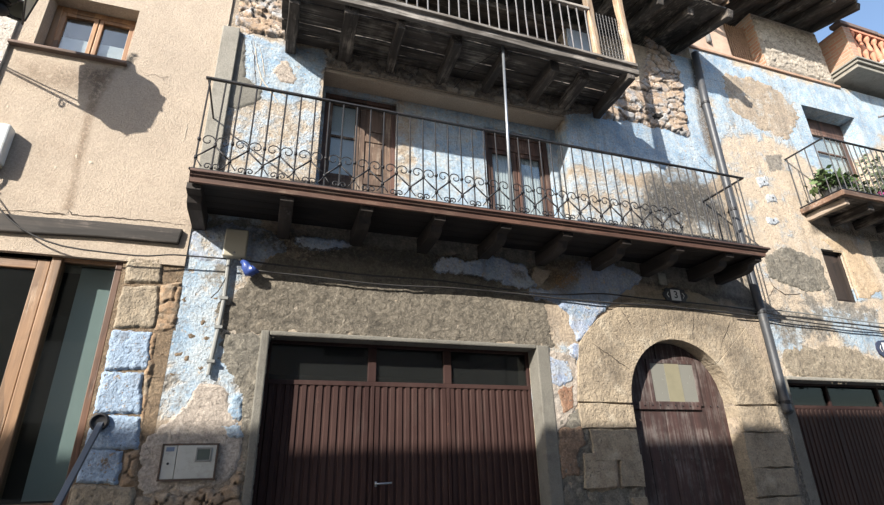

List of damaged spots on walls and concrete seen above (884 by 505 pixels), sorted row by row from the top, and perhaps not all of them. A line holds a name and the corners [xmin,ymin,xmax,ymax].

flaking render [722,72,800,140]
crack [3,210,182,225]
flaking render [764,246,830,292]
flaking render [869,240,884,274]
flaking render [186,222,646,505]
flaking render [782,344,884,385]